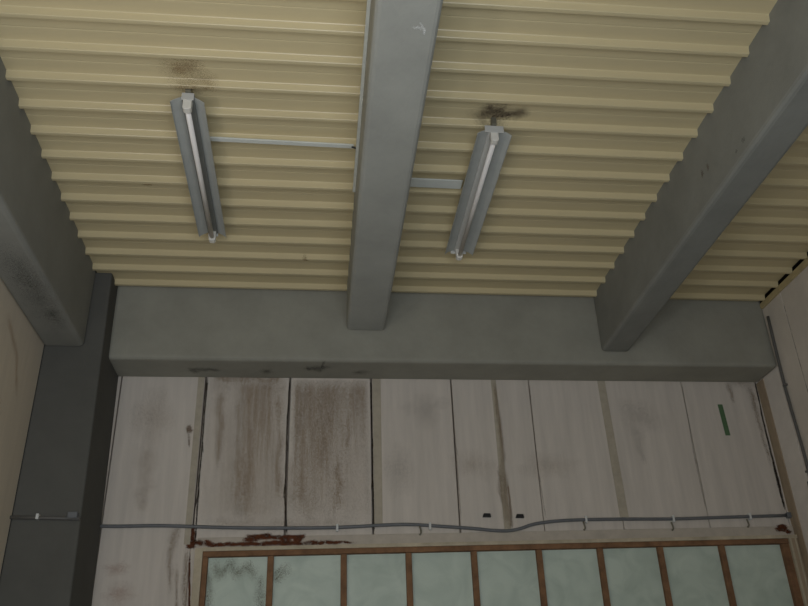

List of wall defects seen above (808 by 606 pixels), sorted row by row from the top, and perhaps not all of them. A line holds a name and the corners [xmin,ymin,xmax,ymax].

damp [188,363,370,535]
rust [185,528,354,606]